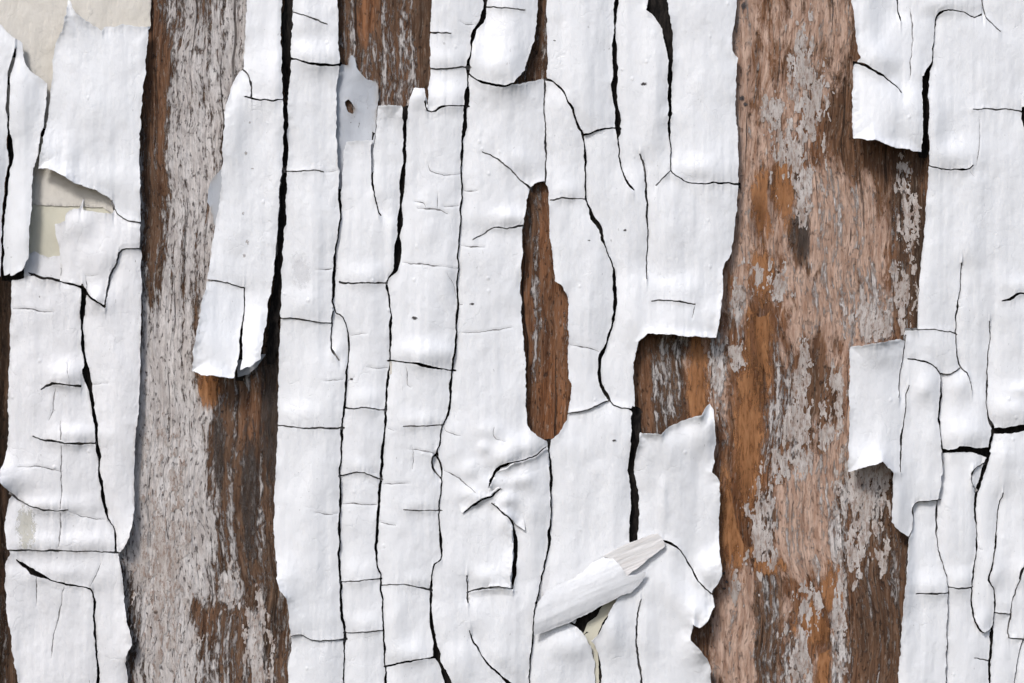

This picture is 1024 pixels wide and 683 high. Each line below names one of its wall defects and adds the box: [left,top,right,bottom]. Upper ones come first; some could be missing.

crack [1,116,142,683]
peeling [0,0,385,683]
crack [208,0,741,683]
peeling [273,0,1024,683]
crack [853,0,1024,177]
crack [898,263,1024,683]